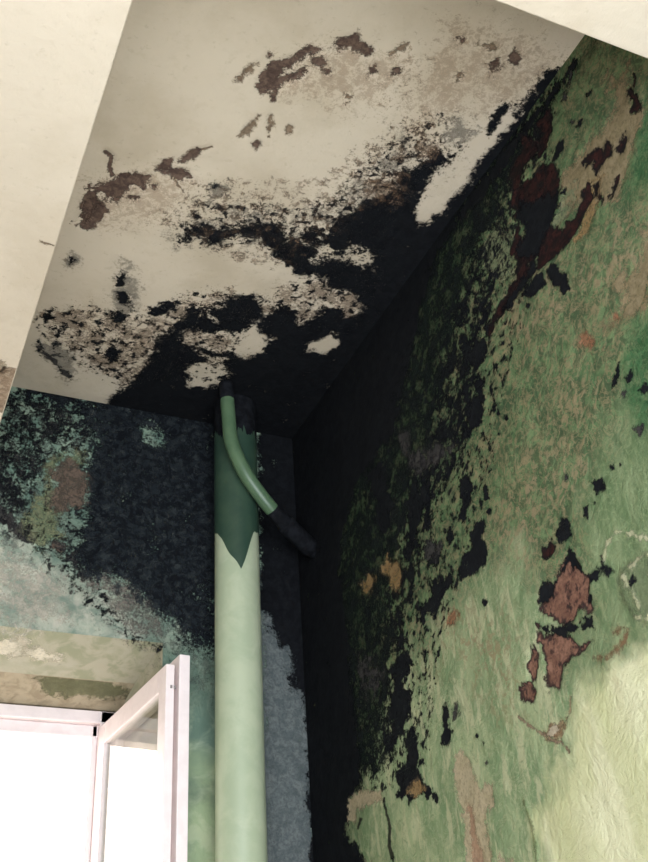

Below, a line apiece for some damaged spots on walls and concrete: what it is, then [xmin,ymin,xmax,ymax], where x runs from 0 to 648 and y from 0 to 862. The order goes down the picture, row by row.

peeling [477,42,522,73]
flaking render [69,195,140,231]
water stain [203,204,246,222]
water stain [518,263,571,309]
water stain [104,291,145,339]
water stain [35,322,72,380]
flaking render [0,360,16,413]
flaking render [518,546,614,704]
water stain [34,676,129,701]
water stain [440,701,461,747]
crack [383,797,394,862]
peeling [453,749,514,862]